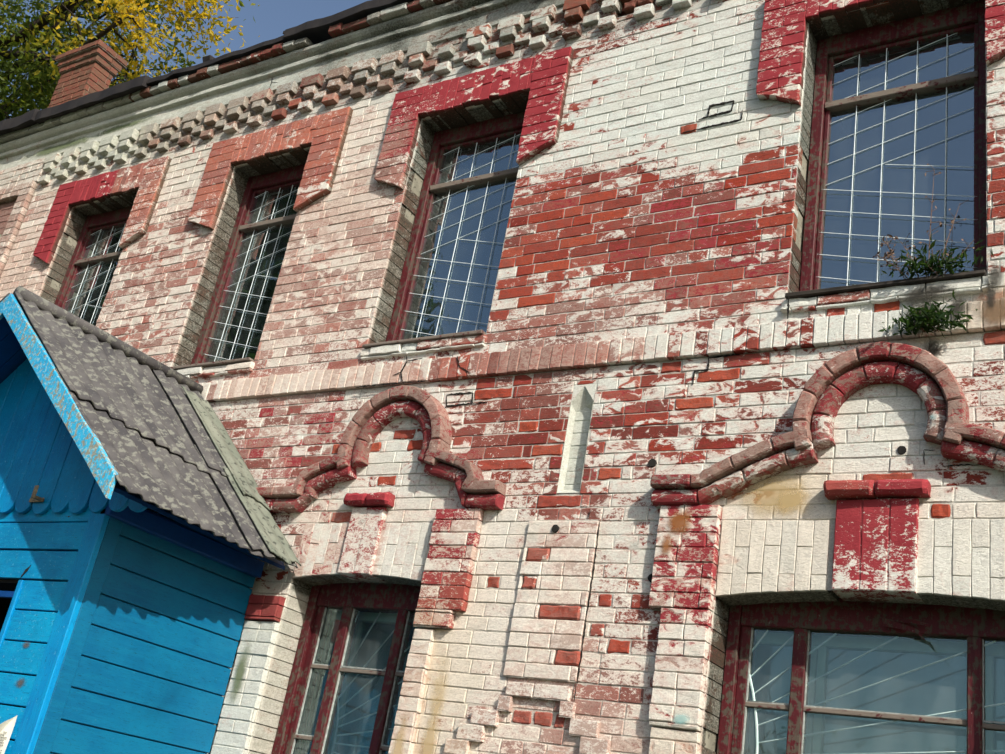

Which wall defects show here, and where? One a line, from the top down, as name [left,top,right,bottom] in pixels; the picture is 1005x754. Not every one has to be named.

peeling [489,189,642,322]
peeling [624,221,744,285]
damp [985,265,1005,320]
corrosion [663,513,689,552]